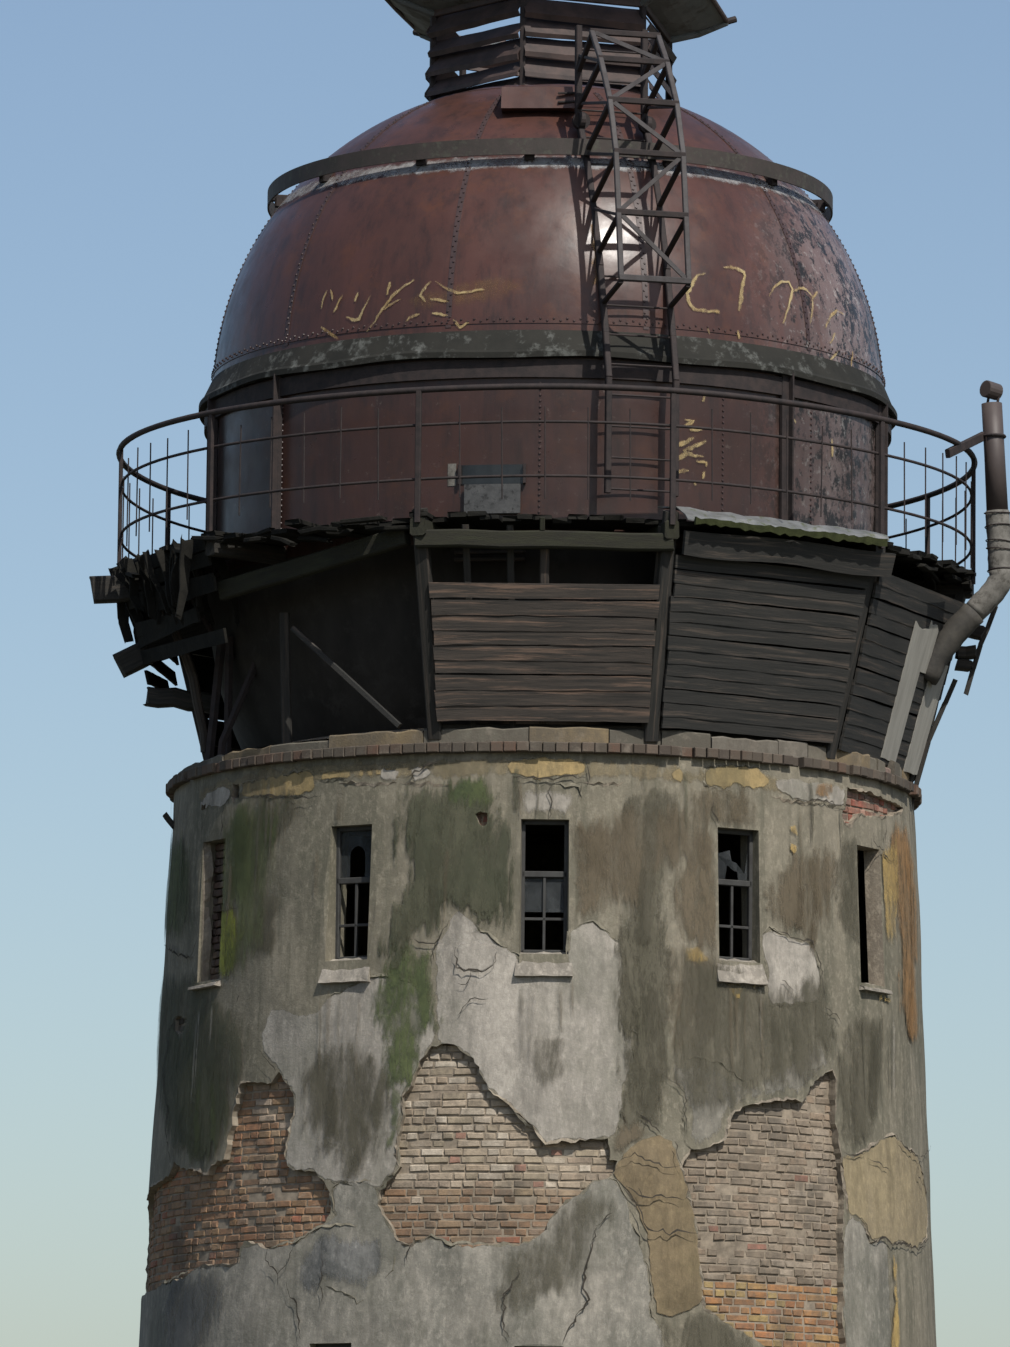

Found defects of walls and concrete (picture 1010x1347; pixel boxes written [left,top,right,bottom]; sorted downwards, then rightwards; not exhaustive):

flaking render [139,911,665,1347]
flaking render [680,1069,928,1347]